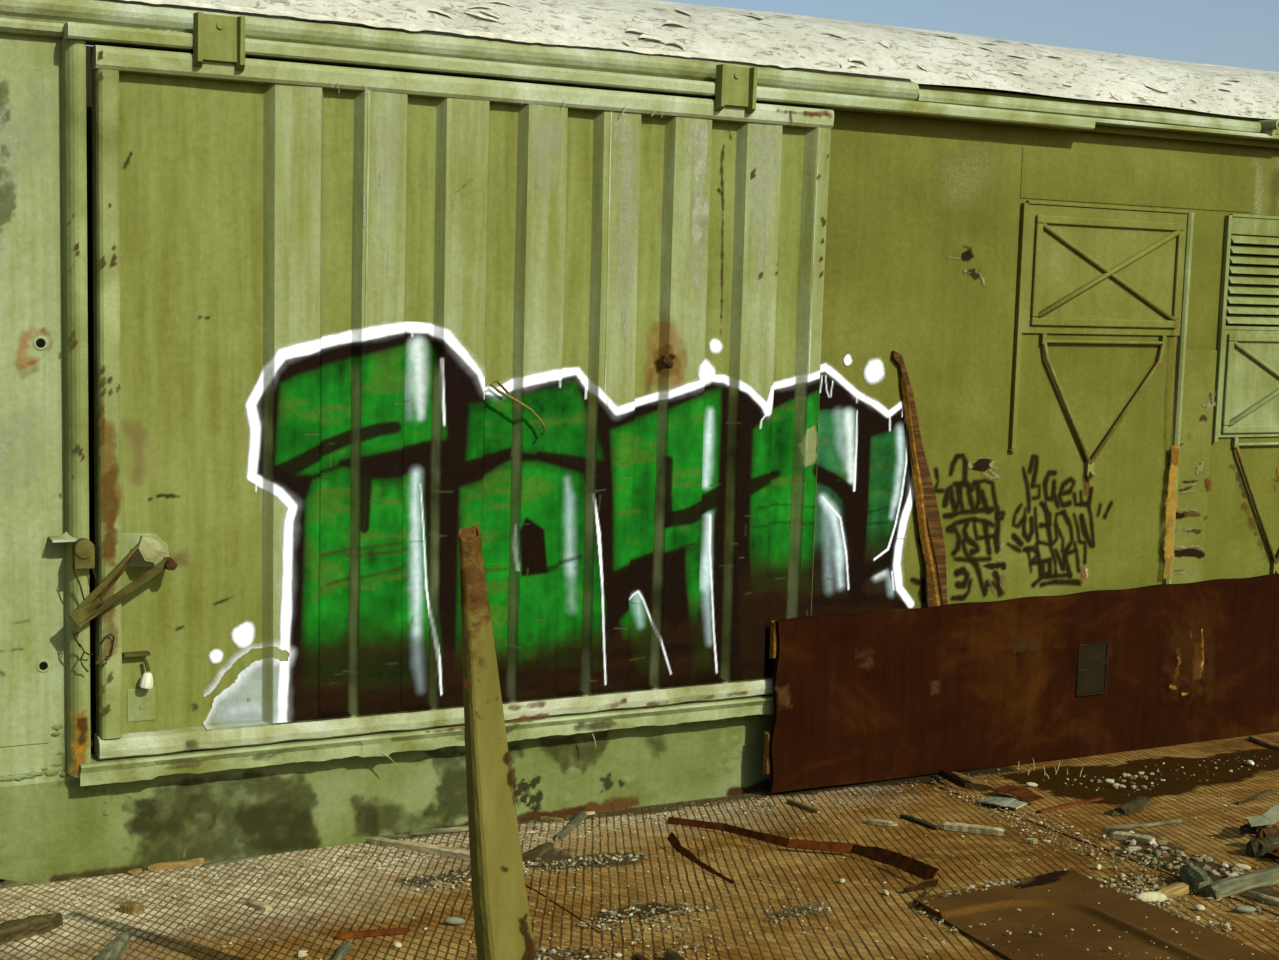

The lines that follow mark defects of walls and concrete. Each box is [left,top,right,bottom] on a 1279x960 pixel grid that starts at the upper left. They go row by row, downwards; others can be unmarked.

rust [648,324,682,386]
rust [99,399,122,565]
rust [1164,445,1179,578]
leakage [132,773,320,870]
leakage [356,750,468,833]
leakage [513,776,543,812]
leakage [543,730,607,768]
leakage [601,773,624,792]